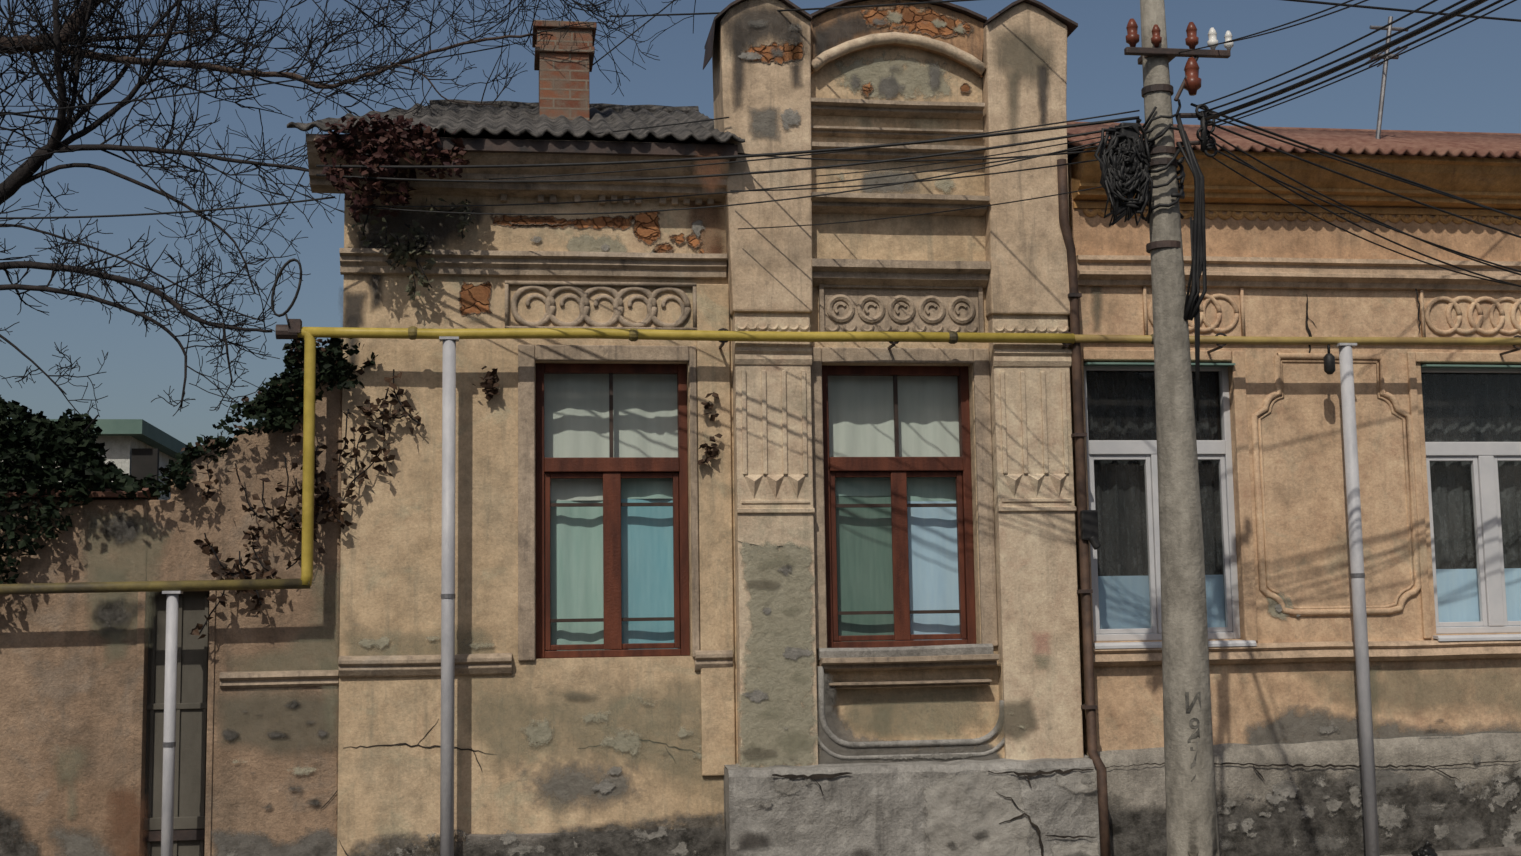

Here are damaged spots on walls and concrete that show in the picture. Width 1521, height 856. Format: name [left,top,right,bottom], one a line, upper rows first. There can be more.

flaking render [859,0,974,39]
flaking render [490,205,720,254]
flaking render [458,281,492,320]
flaking render [739,541,836,808]
flaking render [0,810,39,856]
crack [321,718,488,856]
crack [988,762,1165,856]
flaking render [1050,804,1167,856]
crack [1214,760,1520,781]
flaking render [1216,751,1521,856]